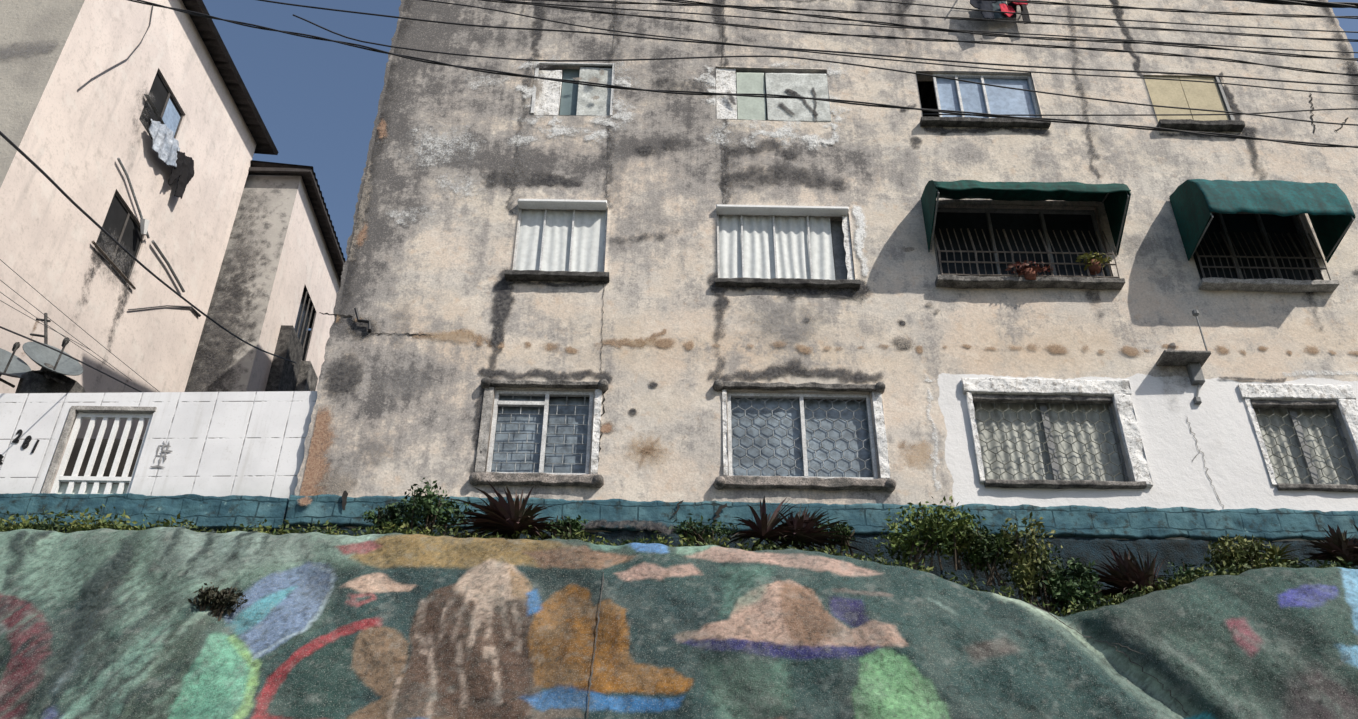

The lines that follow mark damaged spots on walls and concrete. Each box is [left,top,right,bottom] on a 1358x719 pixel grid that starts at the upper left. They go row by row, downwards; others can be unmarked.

water stain [1111,0,1143,77]
peeling [511,57,635,145]
peeling [695,67,736,105]
peeling [707,87,846,148]
water stain [1068,5,1101,177]
water stain [87,243,129,362]
water stain [185,196,266,392]
crack [319,312,434,336]
water stain [470,269,613,473]
water stain [708,272,882,383]
crack [1187,417,1224,509]